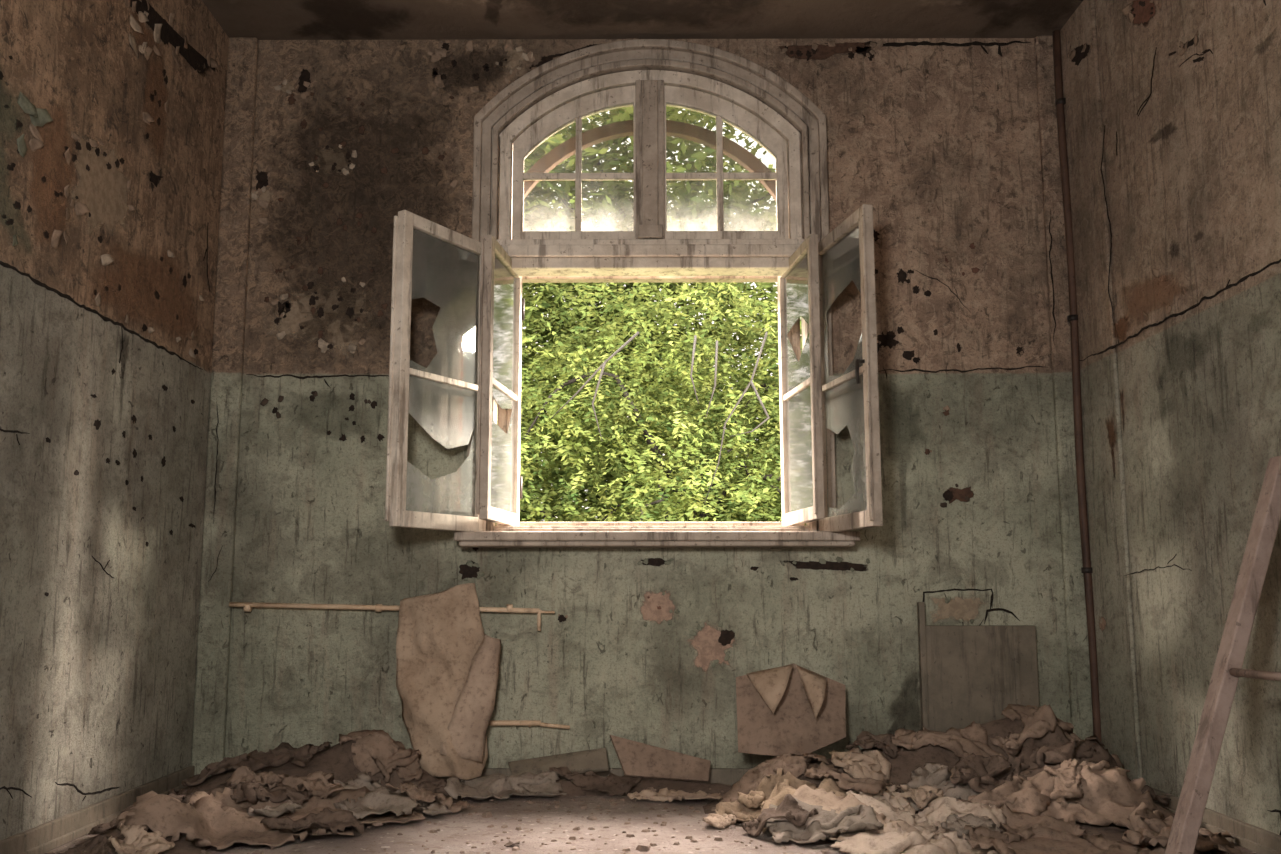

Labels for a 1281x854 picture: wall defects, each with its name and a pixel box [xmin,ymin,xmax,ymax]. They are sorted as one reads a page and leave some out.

peeling [1122,0,1162,26]
peeling [124,0,219,192]
crack [882,47,1281,378]
crack [0,261,203,370]
spalling [940,484,975,508]
spalling [689,621,735,672]